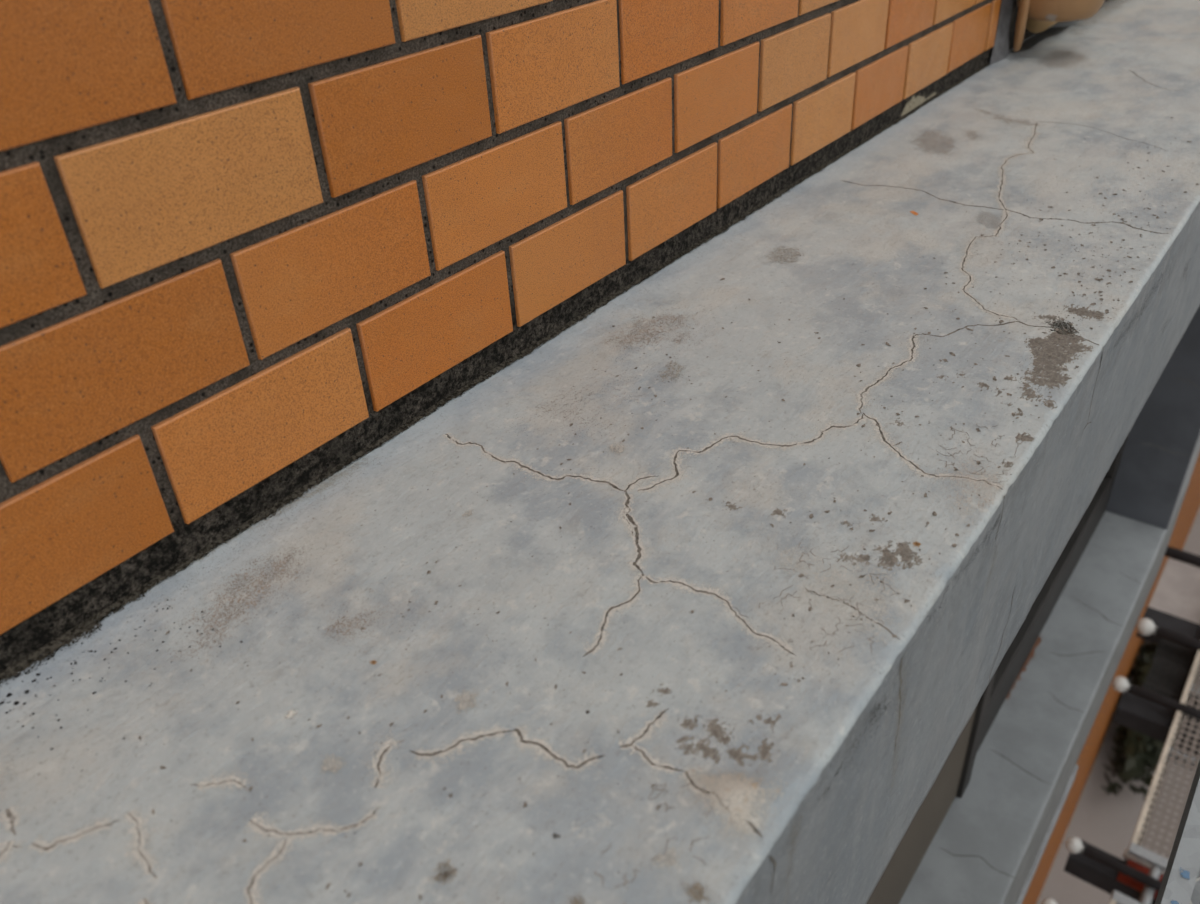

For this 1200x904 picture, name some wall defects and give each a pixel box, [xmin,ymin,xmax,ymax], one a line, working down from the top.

crack [442,122,1169,751]
peeling [977,147,1198,444]
crack [0,760,166,904]
crack [191,708,776,904]